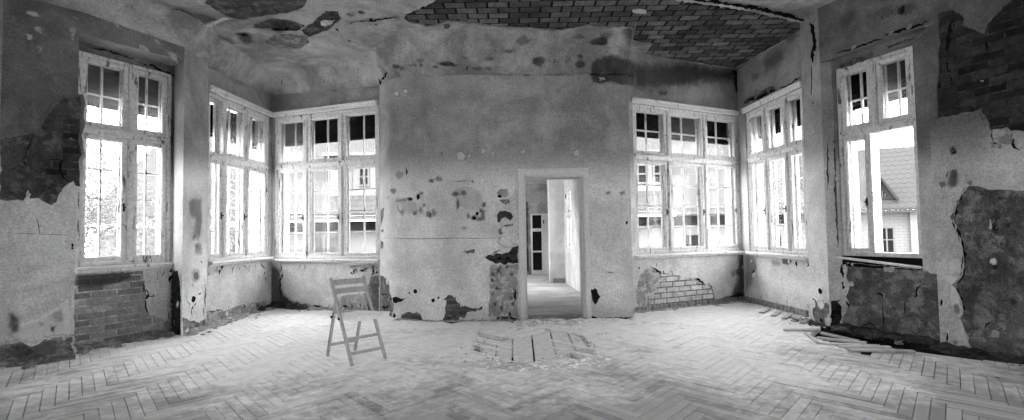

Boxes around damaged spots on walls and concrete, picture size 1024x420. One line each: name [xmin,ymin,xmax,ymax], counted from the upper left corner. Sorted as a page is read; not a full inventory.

peeling [173,0,367,49]
spalling [399,0,803,69]
crack [681,0,928,95]
peeling [831,52,874,74]
spalling [887,0,1024,150]
spalling [0,93,86,208]
spalling [0,268,267,362]
peeling [390,189,436,217]
peeling [429,177,529,321]
spalling [635,265,715,307]
spalling [810,87,1024,357]